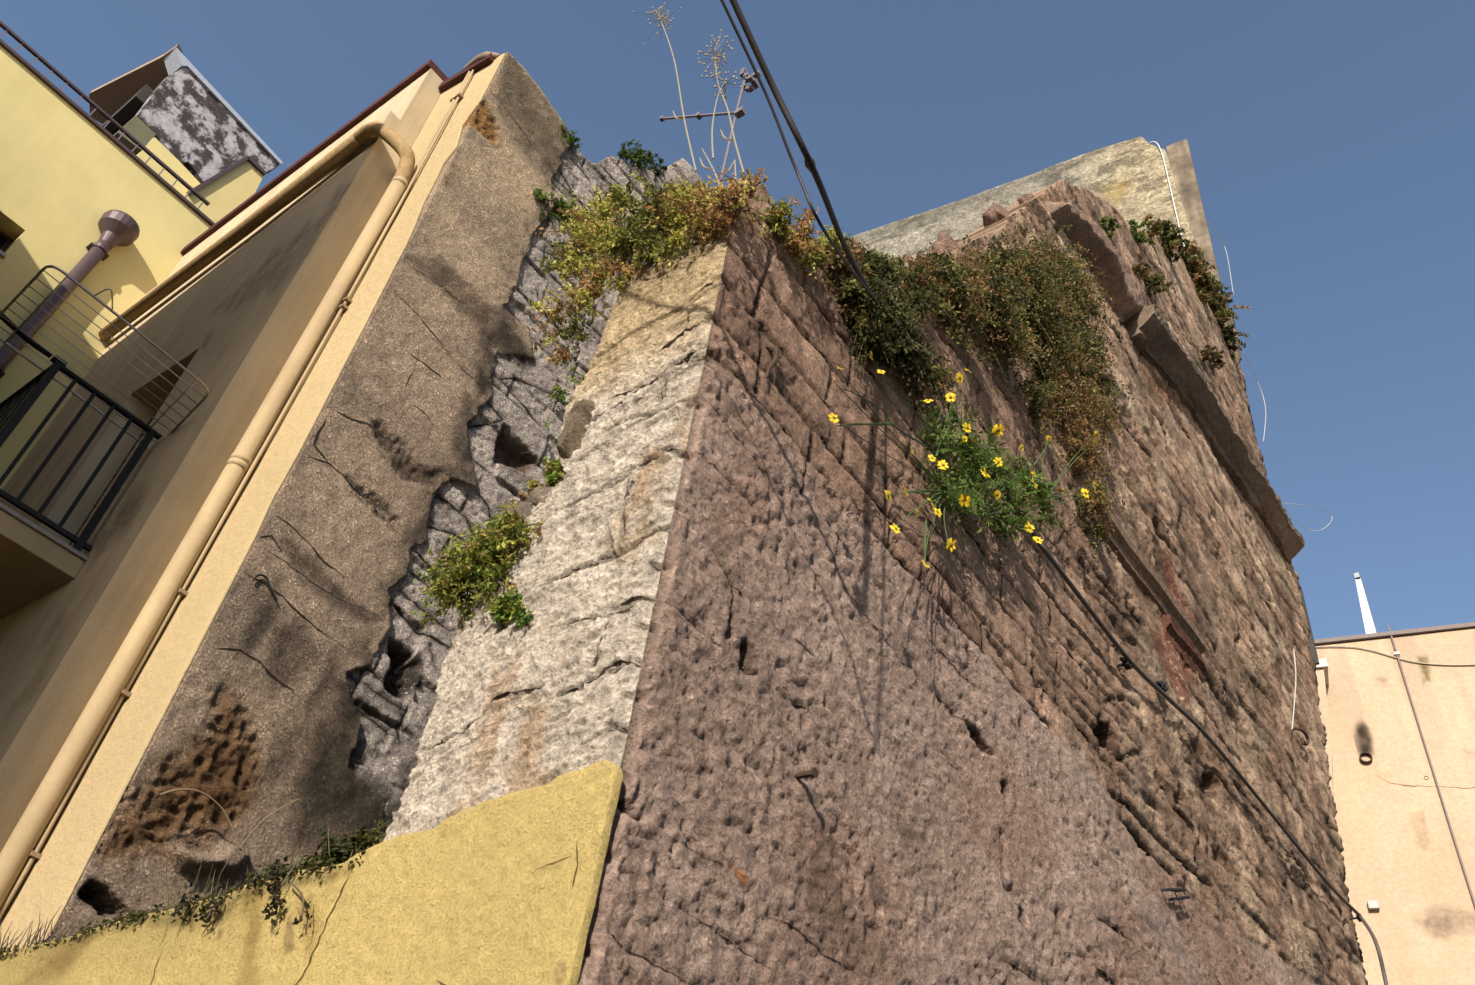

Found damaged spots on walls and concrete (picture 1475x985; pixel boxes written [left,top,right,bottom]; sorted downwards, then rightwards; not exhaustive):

leakage [428,262,529,362]
crack [311,410,402,536]
crack [243,514,381,652]
crack [214,647,299,696]